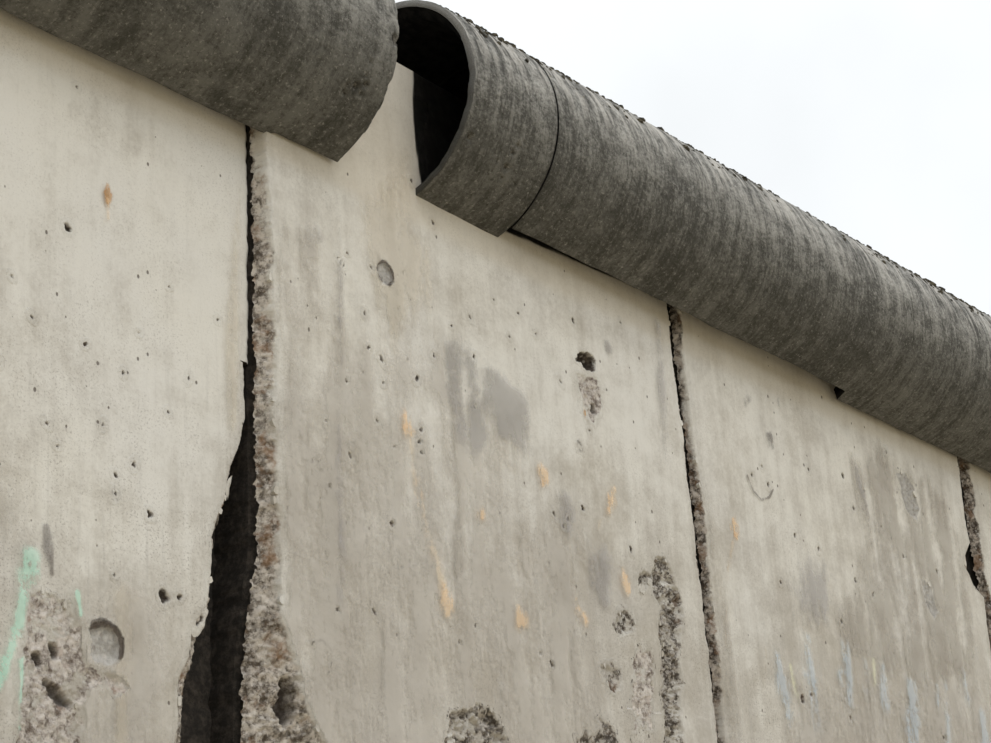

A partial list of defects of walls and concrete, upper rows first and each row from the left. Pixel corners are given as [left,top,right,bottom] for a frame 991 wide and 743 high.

spalling [669,305,733,743]
peeling [12,585,135,743]
spalling [442,700,509,743]
spalling [573,712,618,743]
spalling [597,553,687,743]